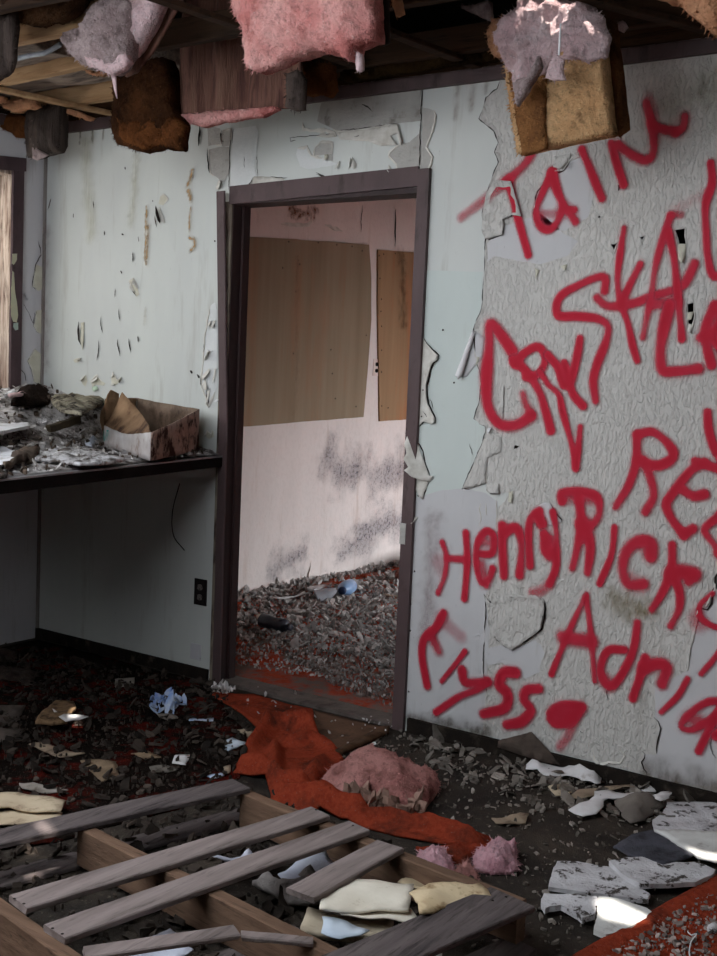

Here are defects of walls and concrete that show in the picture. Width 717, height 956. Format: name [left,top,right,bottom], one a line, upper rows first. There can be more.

peeling [198,126,258,186]
peeling [291,90,437,172]
spalling [155,193,169,223]
spalling [674,227,687,264]
spalling [73,322,84,363]
spalling [80,372,122,391]
peeling [200,303,218,408]
peeling [419,337,439,427]
peeling [455,80,521,503]
spalling [686,302,696,334]
peeling [404,437,433,499]
peeling [593,748,626,765]